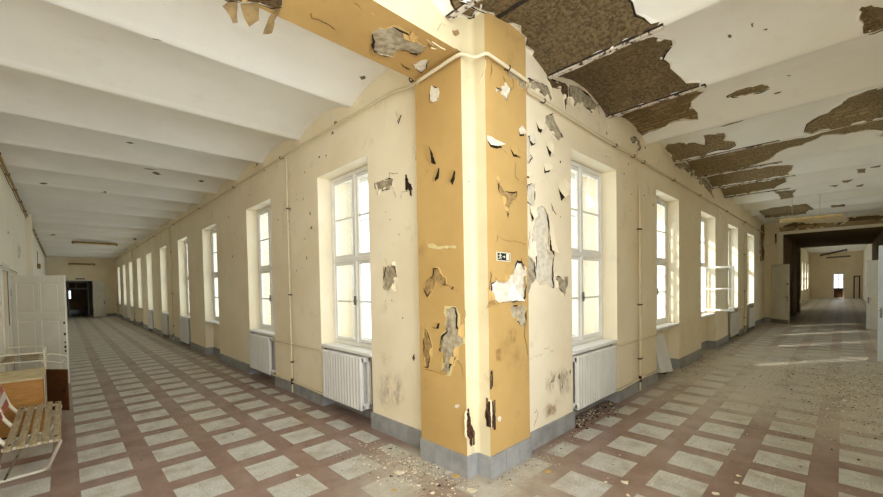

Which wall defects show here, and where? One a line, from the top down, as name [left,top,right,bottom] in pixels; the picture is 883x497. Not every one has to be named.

peeling [225,0,286,9]
peeling [369,25,430,73]
peeling [415,143,455,185]
peeling [487,70,599,327]
peeling [759,215,883,261]
peeling [382,262,398,302]
peeling [424,267,454,298]
peeling [412,306,466,376]
spalling [484,370,501,430]
spalling [455,404,475,447]